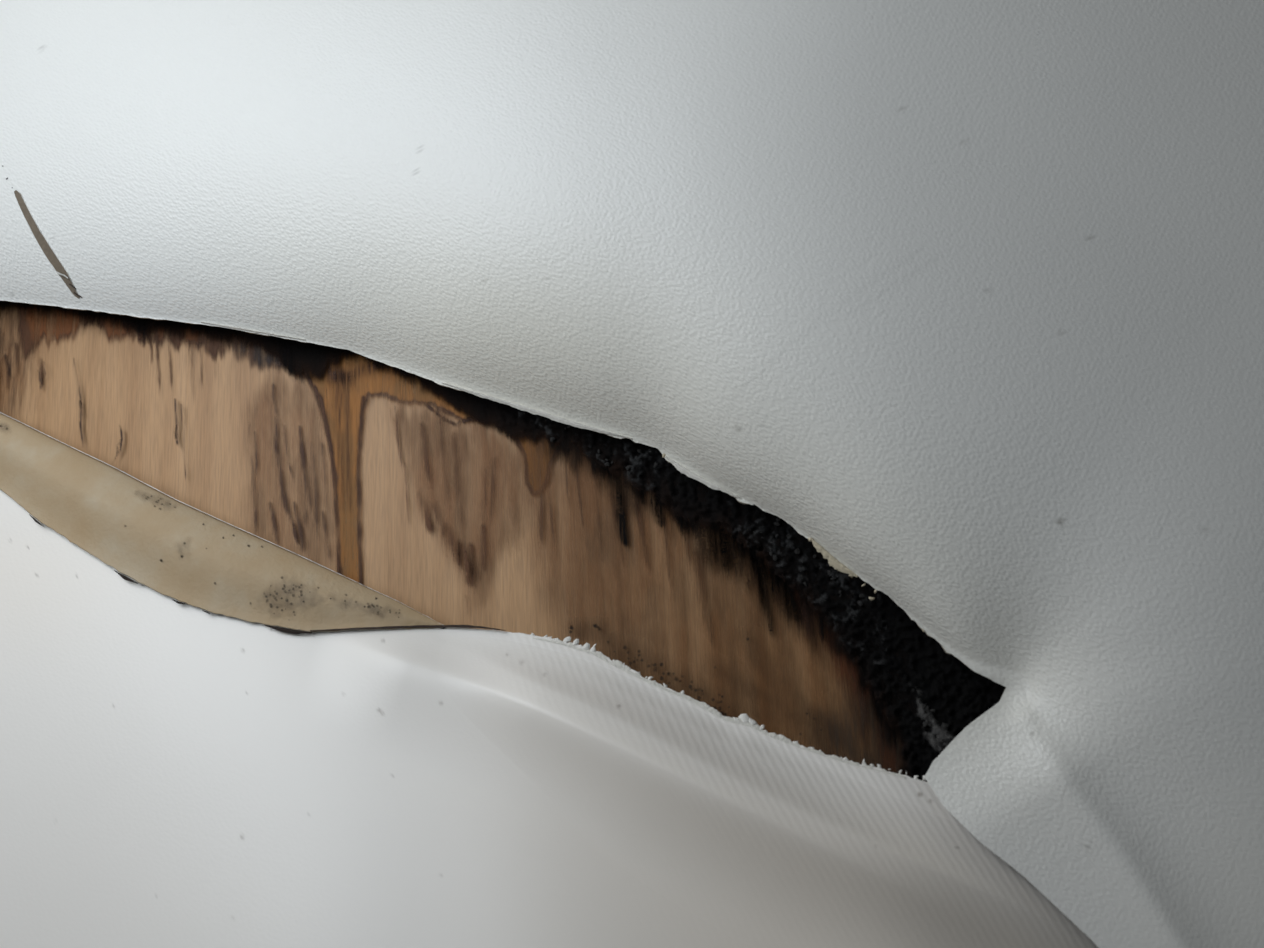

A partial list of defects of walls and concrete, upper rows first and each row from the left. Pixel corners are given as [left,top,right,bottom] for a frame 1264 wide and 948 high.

peeling [0,413,506,634]
damp [0,301,1006,782]
peeling [531,633,684,694]
peeling [707,705,765,730]